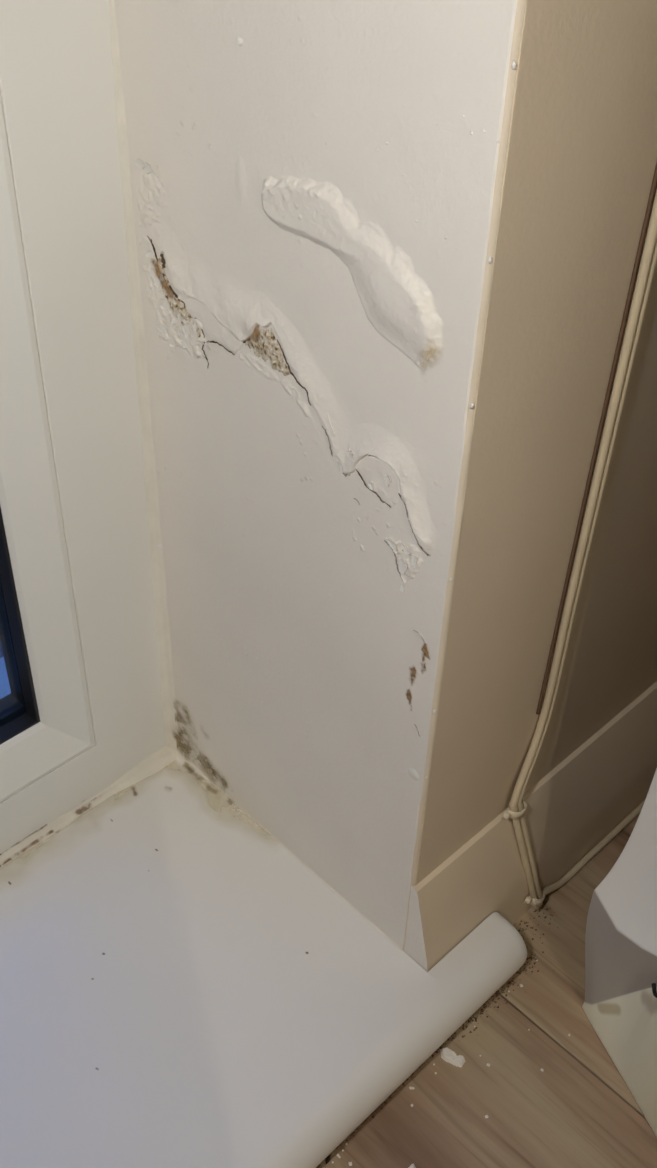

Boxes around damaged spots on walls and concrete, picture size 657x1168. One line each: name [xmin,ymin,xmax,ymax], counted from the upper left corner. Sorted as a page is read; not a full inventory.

crack [147,236,249,369]
peeling [138,218,447,592]
crack [277,340,430,556]
leakage [174,709,225,784]